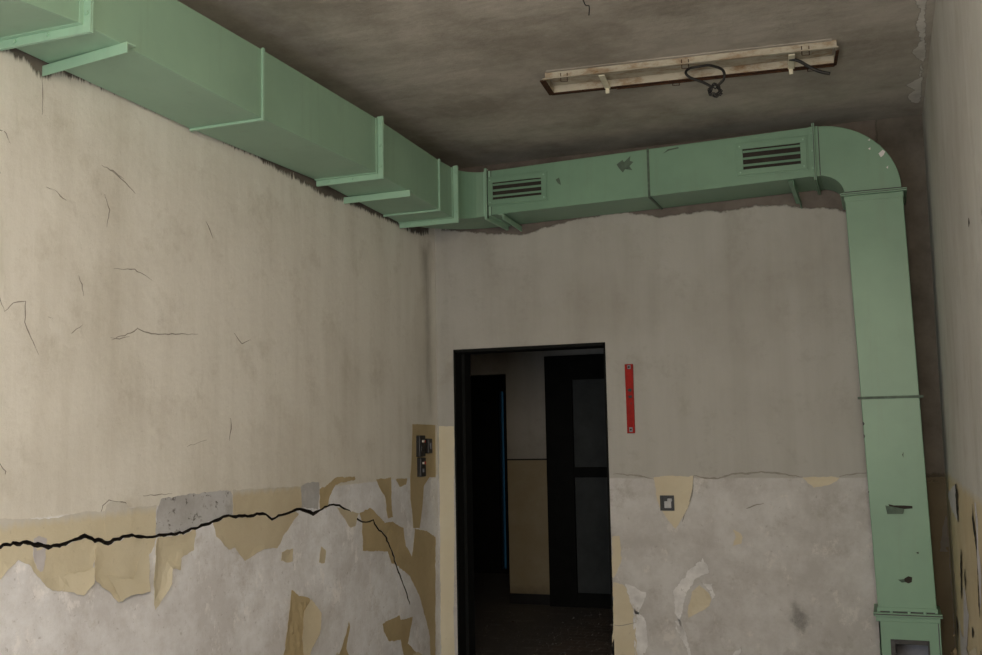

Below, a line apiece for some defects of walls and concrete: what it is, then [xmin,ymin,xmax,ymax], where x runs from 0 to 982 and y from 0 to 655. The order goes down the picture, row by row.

crack [102,165,136,223]
crack [0,299,81,355]
crack [112,328,190,340]
peeling [615,471,865,529]
peeling [948,485,957,520]
crack [0,504,410,604]
peeling [0,424,455,655]
peeling [612,536,637,655]
peeling [951,588,969,655]